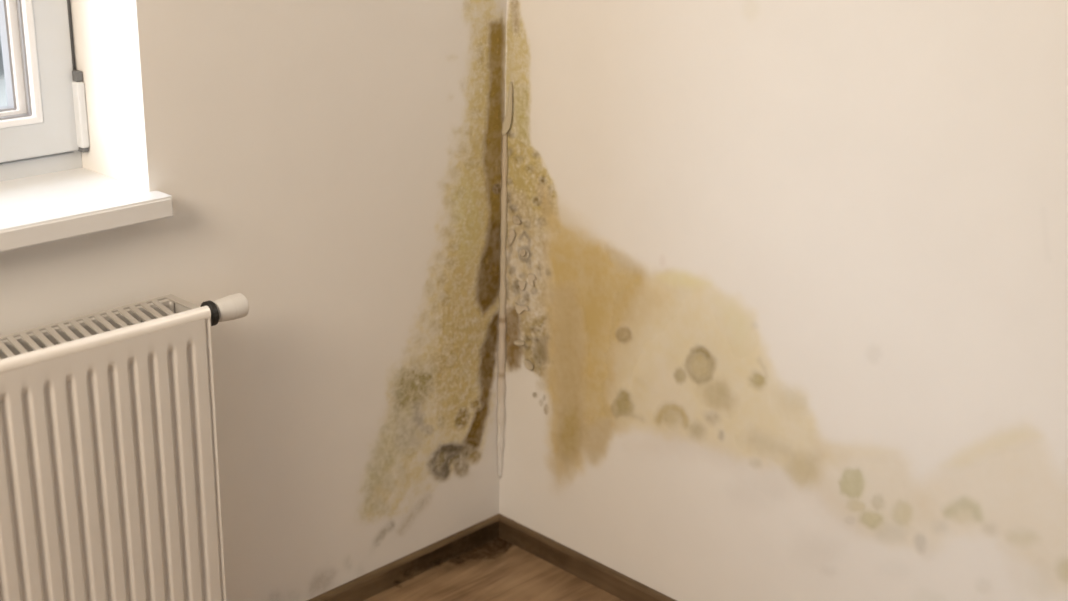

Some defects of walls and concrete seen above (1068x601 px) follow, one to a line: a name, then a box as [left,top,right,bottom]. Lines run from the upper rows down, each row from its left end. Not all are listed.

leakage [487,30,501,151]
leakage [441,176,518,477]